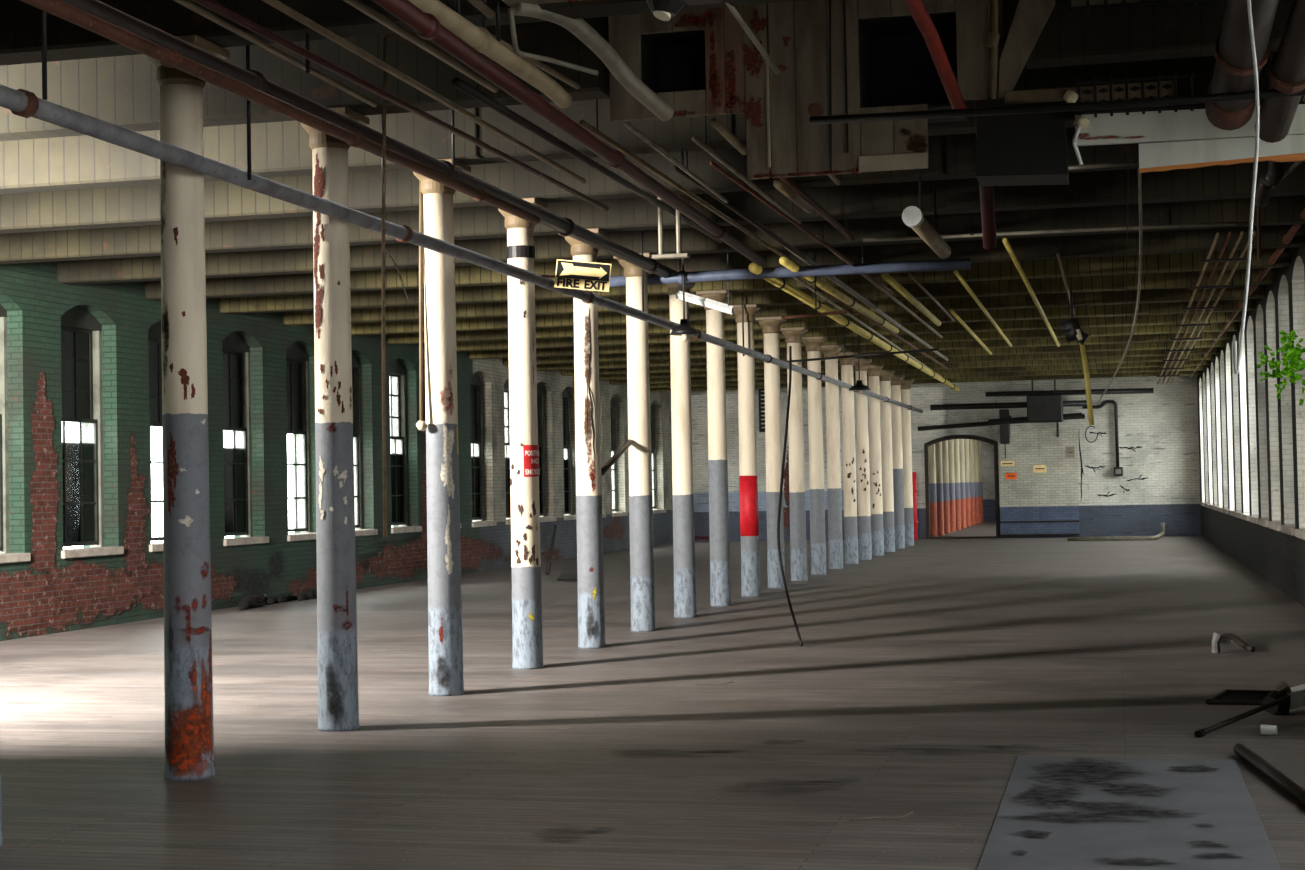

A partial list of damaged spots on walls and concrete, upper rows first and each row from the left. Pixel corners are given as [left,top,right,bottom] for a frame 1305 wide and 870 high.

peeling [0,370,164,640]
spalling [167,432,193,527]
peeling [210,559,239,602]
spalling [319,457,348,524]
peeling [356,356,563,585]
corrosion [167,595,214,775]